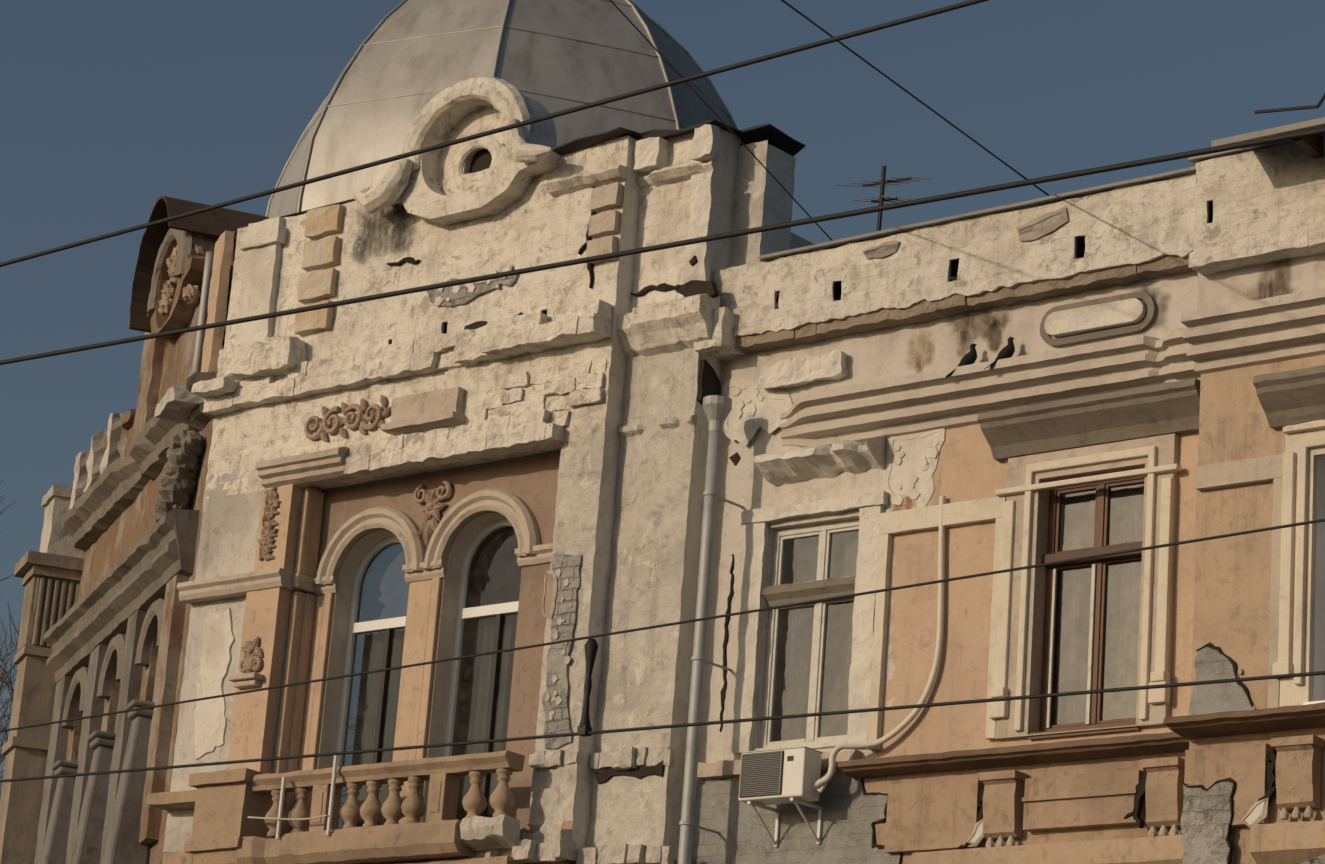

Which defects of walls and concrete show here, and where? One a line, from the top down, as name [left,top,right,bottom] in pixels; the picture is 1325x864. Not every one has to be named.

leakage [954,311,1005,353]
flaking render [883,429,945,509]
crack [719,554,734,732]
flaking render [1187,642,1256,715]
flaking render [1180,778,1269,864]